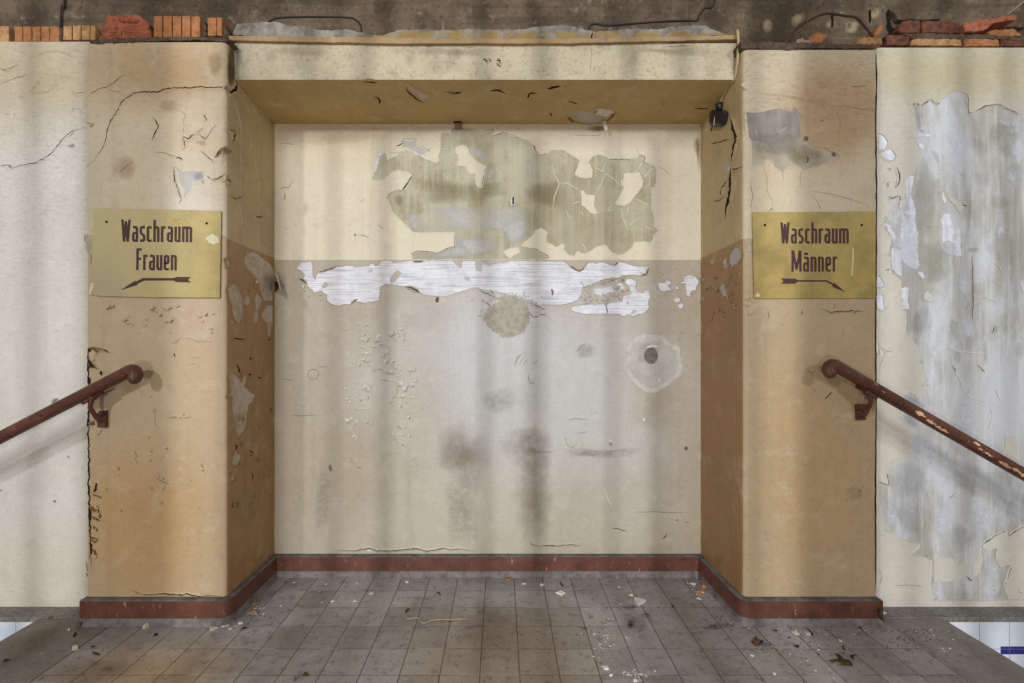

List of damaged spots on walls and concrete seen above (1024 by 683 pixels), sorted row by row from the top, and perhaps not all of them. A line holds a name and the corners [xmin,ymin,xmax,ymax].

crack [2,71,239,170]
peeling [564,106,618,131]
peeling [744,105,841,174]
peeling [295,127,753,338]
crack [86,348,94,385]
flaking render [623,334,683,394]
crack [694,57,939,599]
peeling [876,90,1024,603]
peeling [226,371,256,484]
crack [85,410,93,577]